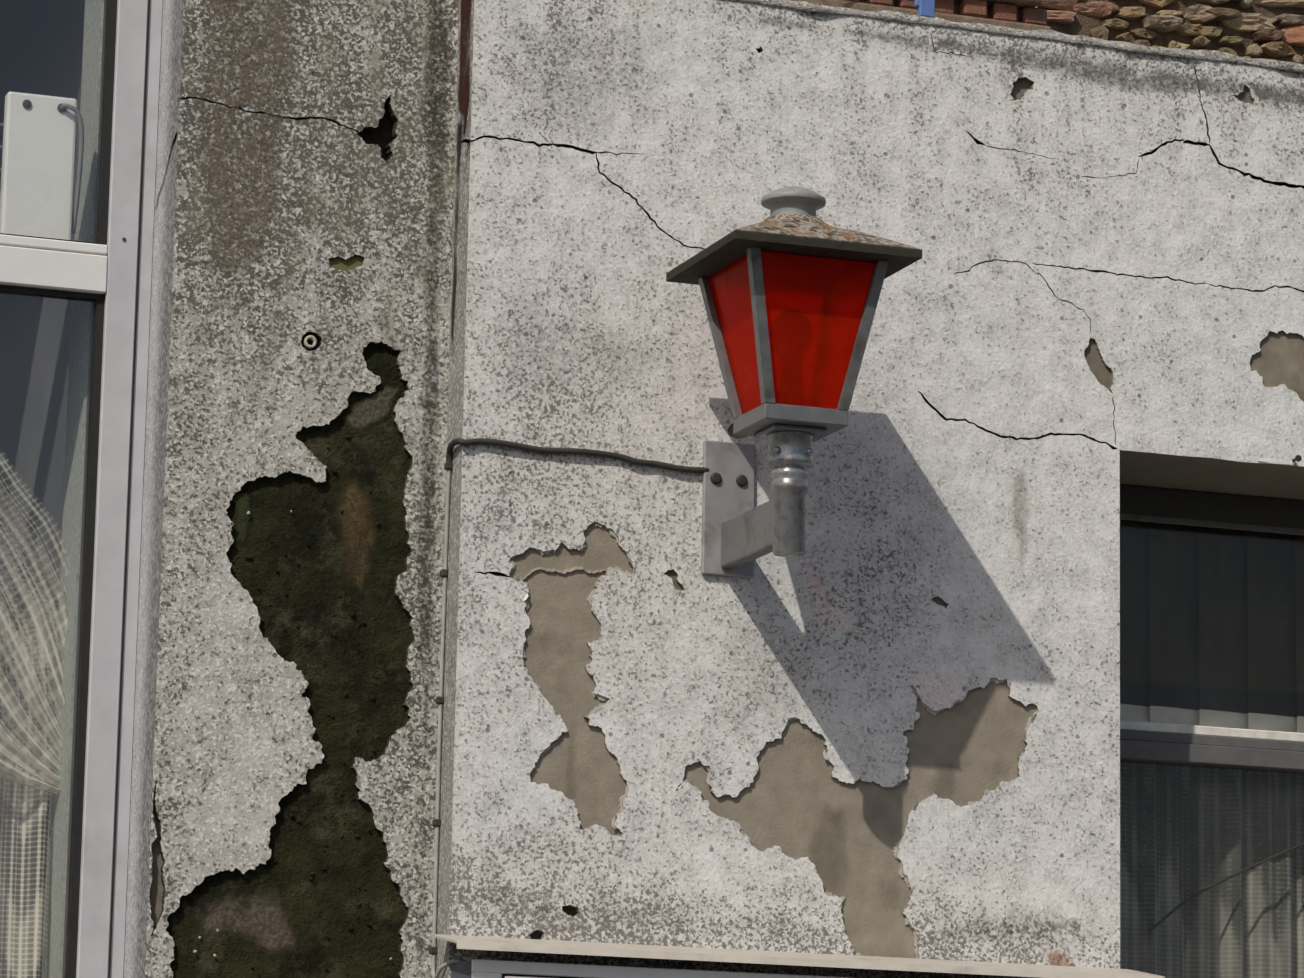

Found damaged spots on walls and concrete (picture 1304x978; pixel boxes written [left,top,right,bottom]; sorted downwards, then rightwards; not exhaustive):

crack [178,97,362,135]
spalling [357,96,398,163]
crack [966,131,1055,159]
crack [1082,66,1304,189]
crack [460,135,705,249]
crack [954,259,1304,332]
spalling [1084,338,1113,393]
peeling [1250,330,1304,402]
crack [918,391,1117,449]
peeling [509,521,637,835]
peeling [673,677,1039,958]
spalling [149,779,172,937]